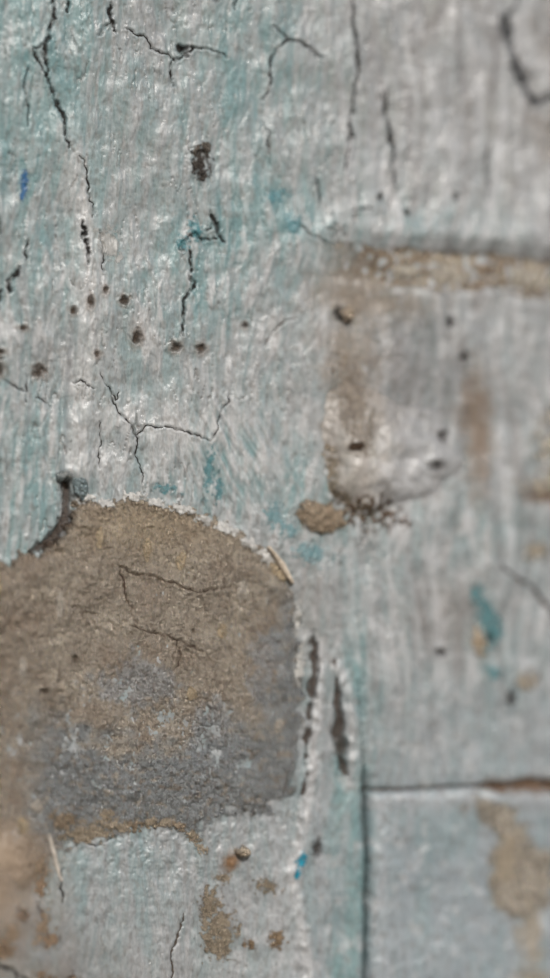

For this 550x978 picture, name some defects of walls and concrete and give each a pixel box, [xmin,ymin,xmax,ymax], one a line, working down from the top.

crack [106,4,227,86]
crack [23,0,105,270]
crack [0,242,29,299]
crack [179,213,225,331]
crack [0,358,46,403]
crack [76,373,230,481]
crack [119,566,232,668]
spalling [0,490,307,888]